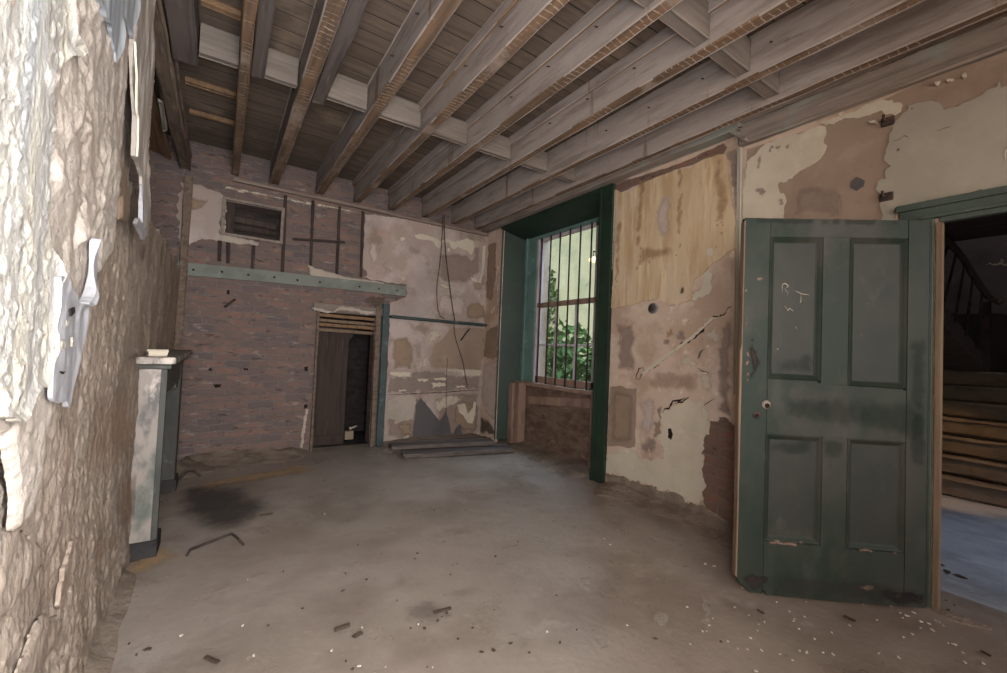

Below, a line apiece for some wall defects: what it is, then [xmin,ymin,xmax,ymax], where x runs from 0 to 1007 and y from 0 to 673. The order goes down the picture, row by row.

peeling [742,81,1007,220]
peeling [0,0,156,531]
flaking render [400,234,486,283]
flaking render [387,327,485,438]
crack [635,306,731,380]
crack [662,397,714,414]
water stain [186,465,311,525]
flaking render [605,417,735,526]